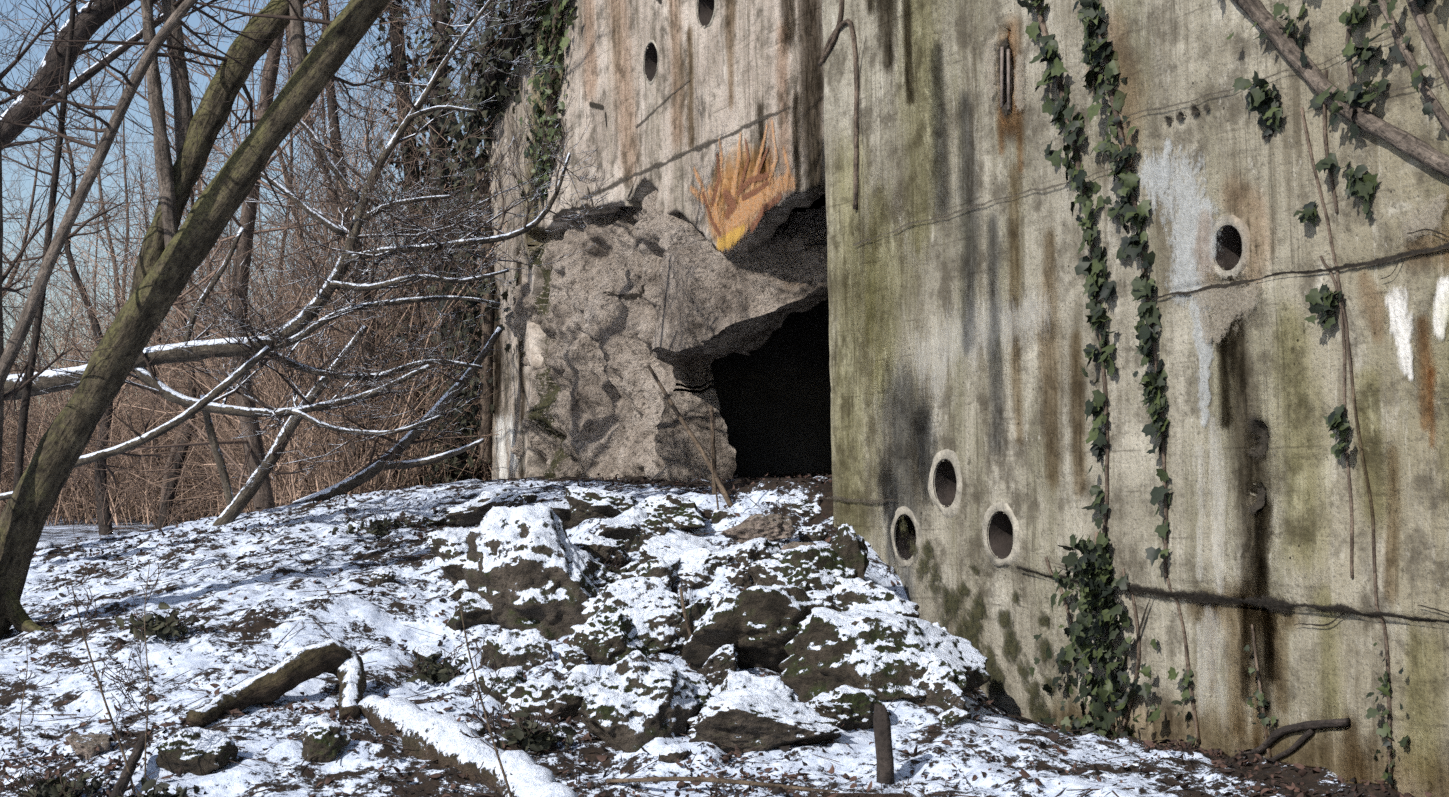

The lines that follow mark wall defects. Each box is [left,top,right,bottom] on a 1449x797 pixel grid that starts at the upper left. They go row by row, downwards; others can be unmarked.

spalling [495,189,828,482]
damp [1139,139,1274,717]